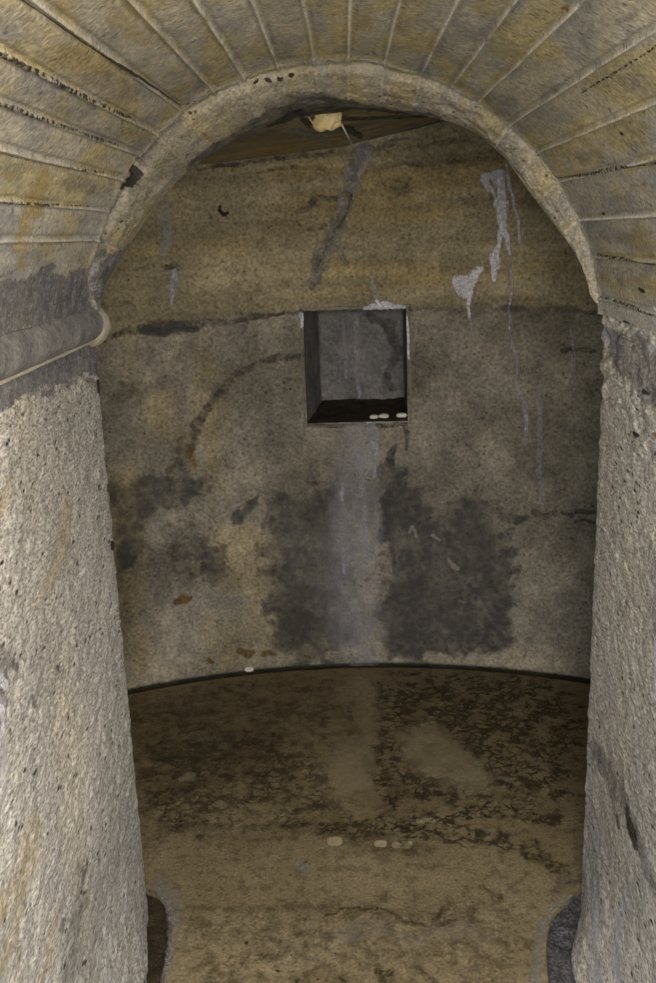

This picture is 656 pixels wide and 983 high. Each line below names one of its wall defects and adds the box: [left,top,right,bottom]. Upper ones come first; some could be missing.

spalling [120,119,181,190]
crack [306,116,445,290]
efflorescence [452,163,521,329]
leakage [107,474,207,534]
leakage [261,484,355,667]
leakage [360,422,520,660]
leakage [144,666,585,874]